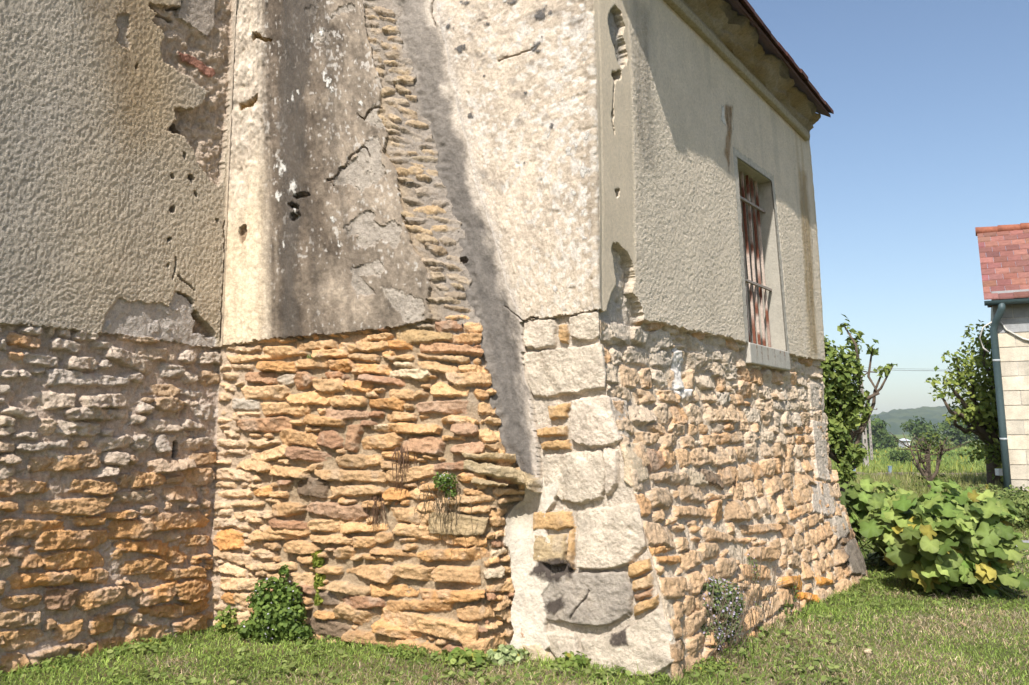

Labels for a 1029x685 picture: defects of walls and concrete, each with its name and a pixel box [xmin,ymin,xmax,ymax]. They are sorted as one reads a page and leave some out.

spalling [116,12,132,50]
spalling [608,5,628,81]
spalling [148,0,258,197]
water stain [279,0,316,335]
crack [326,145,371,181]
peeling [332,76,387,192]
crack [359,105,383,120]
spalling [102,290,218,347]
peeling [343,210,426,324]
spalling [600,242,644,327]